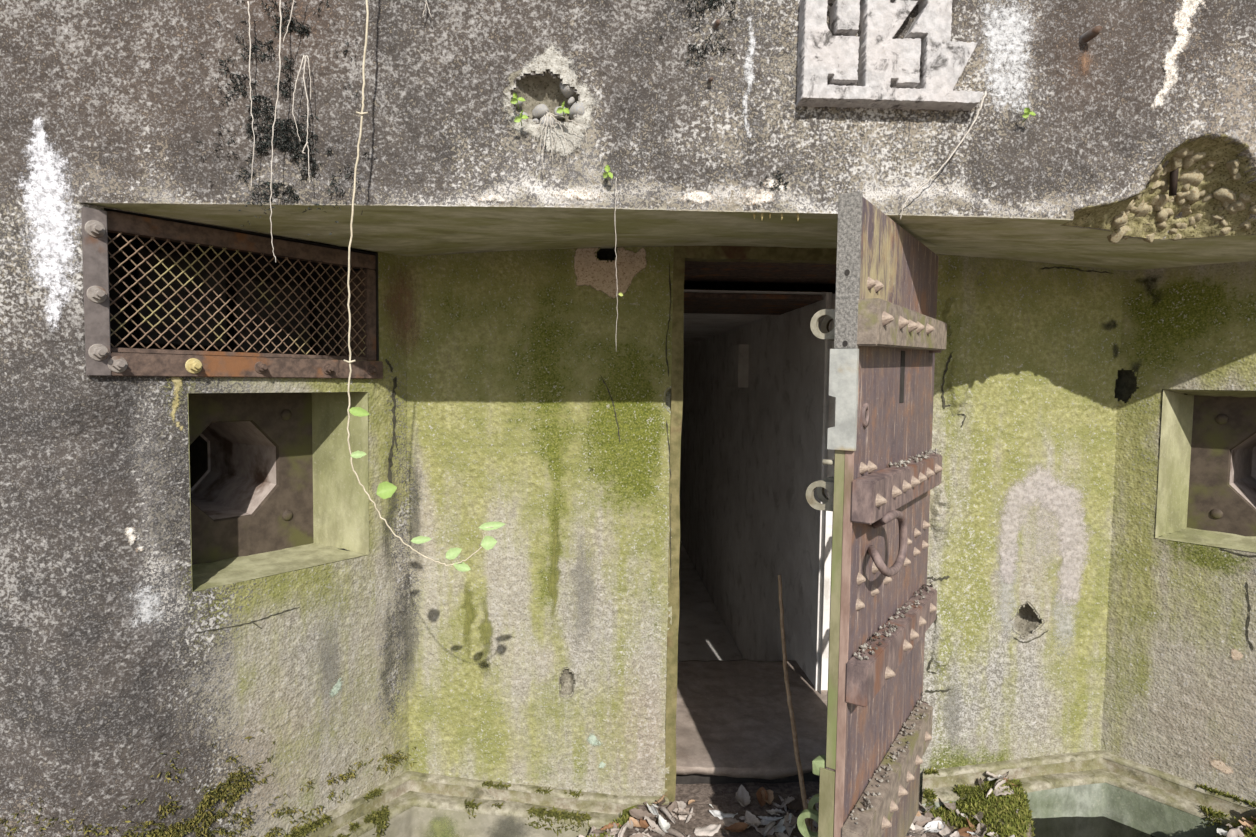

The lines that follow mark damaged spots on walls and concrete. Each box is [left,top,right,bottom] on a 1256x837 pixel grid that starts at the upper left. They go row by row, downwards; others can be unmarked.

spalling [500,39,600,157]
water stain [1151,0,1206,109]
water stain [19,117,81,327]
peeling [574,247,647,299]
spalling [1062,134,1256,244]
water stain [463,588,492,670]
water stain [548,519,560,613]
crack [1220,548,1256,651]